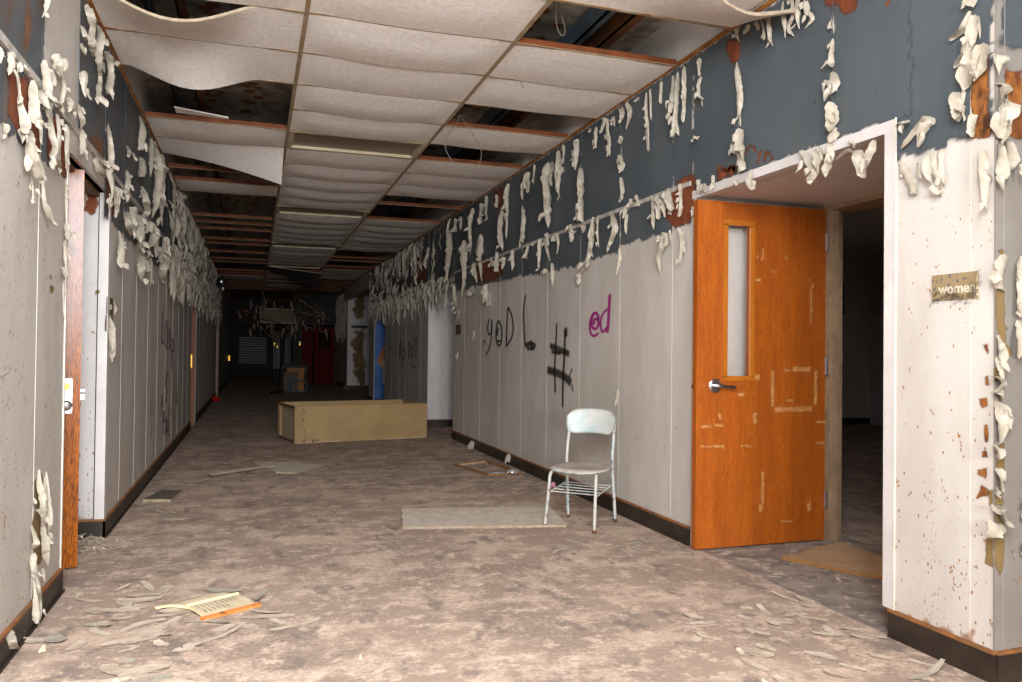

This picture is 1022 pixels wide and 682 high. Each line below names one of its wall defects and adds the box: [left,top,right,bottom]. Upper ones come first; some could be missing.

rust [7,71,66,177]
peeling [0,0,222,326]
peeling [335,0,1022,385]
rust [665,174,696,227]
rust [726,39,740,63]
rust [825,0,857,15]
rust [970,58,991,139]
rust [1004,70,1022,139]
rust [896,398,991,517]
peeling [985,250,1022,575]
peeling [30,470,54,624]
rust [914,559,987,633]